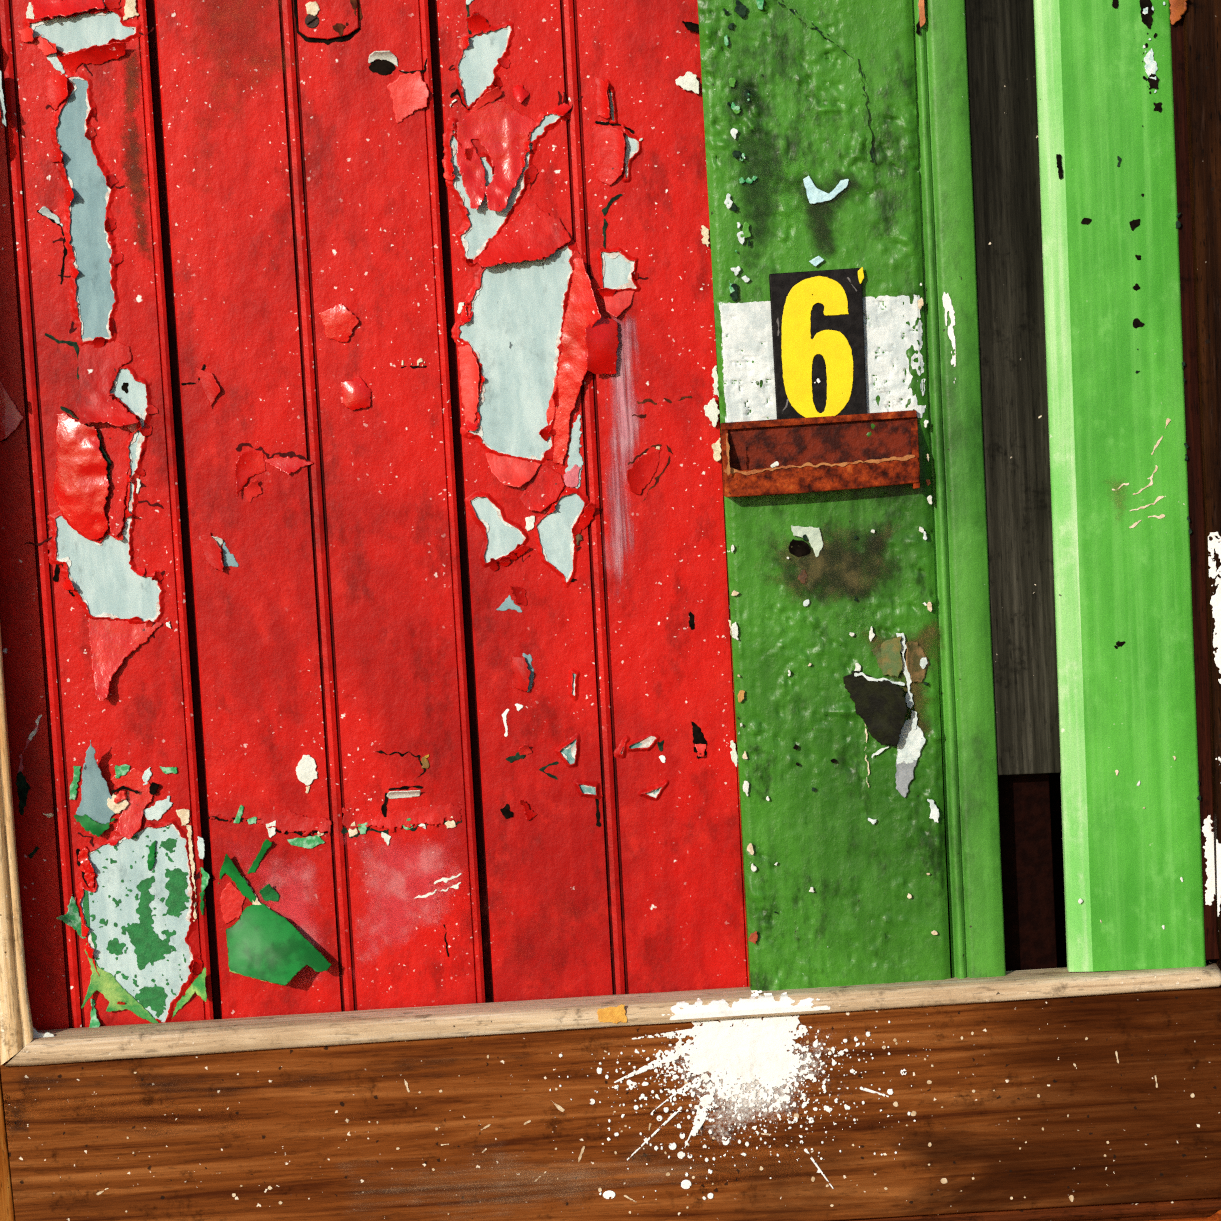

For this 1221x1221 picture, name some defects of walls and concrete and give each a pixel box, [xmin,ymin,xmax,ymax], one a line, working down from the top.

peeling [1139,0,1166,112]
peeling [442,0,648,588]
peeling [724,193,751,301]
peeling [18,0,171,701]
peeling [496,586,527,612]
peeling [376,750,429,817]
peeling [539,733,603,827]
peeling [614,732,666,763]
peeling [691,722,707,759]
peeling [843,626,929,798]
peeling [927,799,939,823]
peeling [57,740,331,1028]